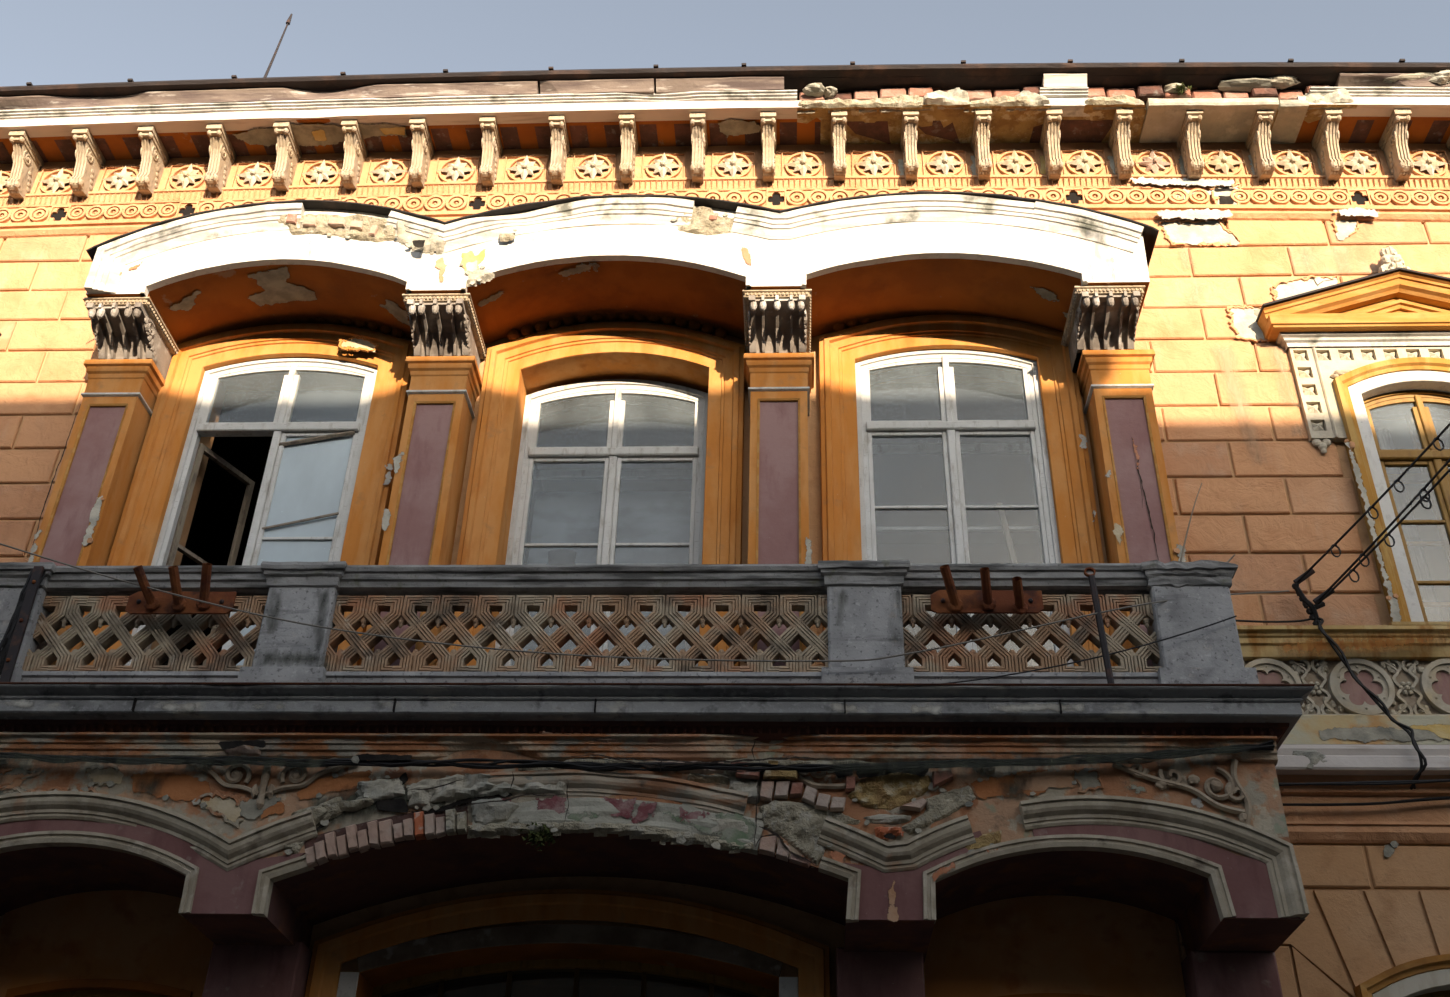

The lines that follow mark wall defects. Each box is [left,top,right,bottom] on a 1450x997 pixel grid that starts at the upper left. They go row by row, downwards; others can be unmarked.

spalling [277,214,517,307]
spalling [671,206,734,236]
flaking render [1107,155,1255,247]
flaking render [1226,275,1339,343]
spalling [131,731,1104,868]